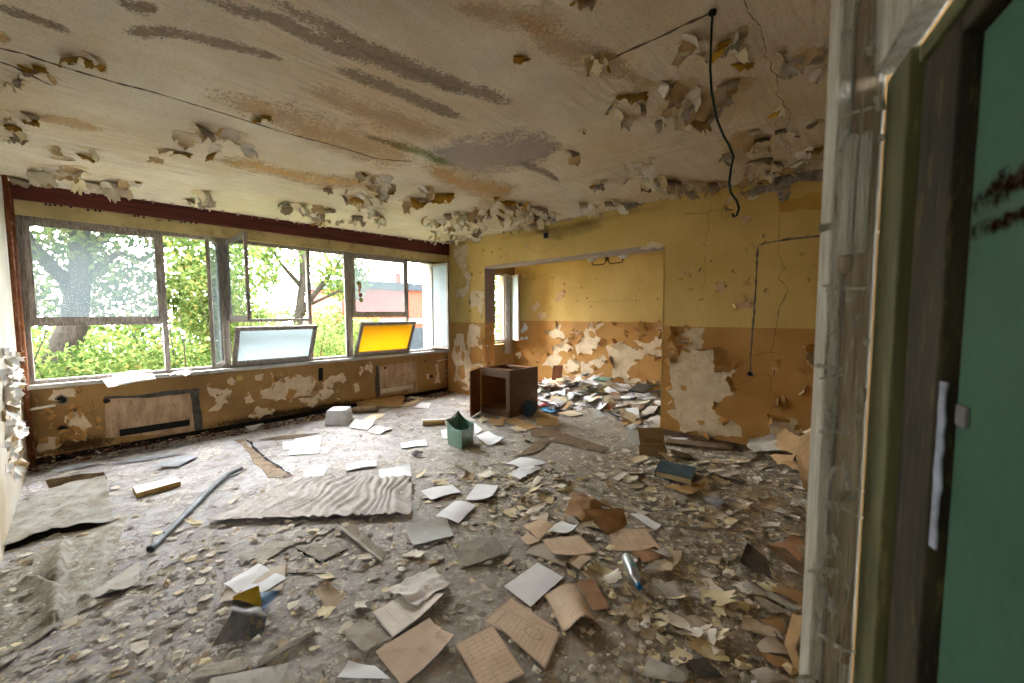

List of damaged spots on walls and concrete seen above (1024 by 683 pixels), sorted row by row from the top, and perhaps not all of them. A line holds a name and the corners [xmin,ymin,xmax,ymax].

peeling [0,50,108,94]
leakage [119,0,282,61]
leakage [207,0,511,120]
peeling [0,109,40,146]
peeling [0,145,156,204]
peeling [146,112,276,165]
leakage [429,130,561,182]
corrosion [971,163,1024,236]
peeling [170,25,888,665]
peeling [0,348,104,481]